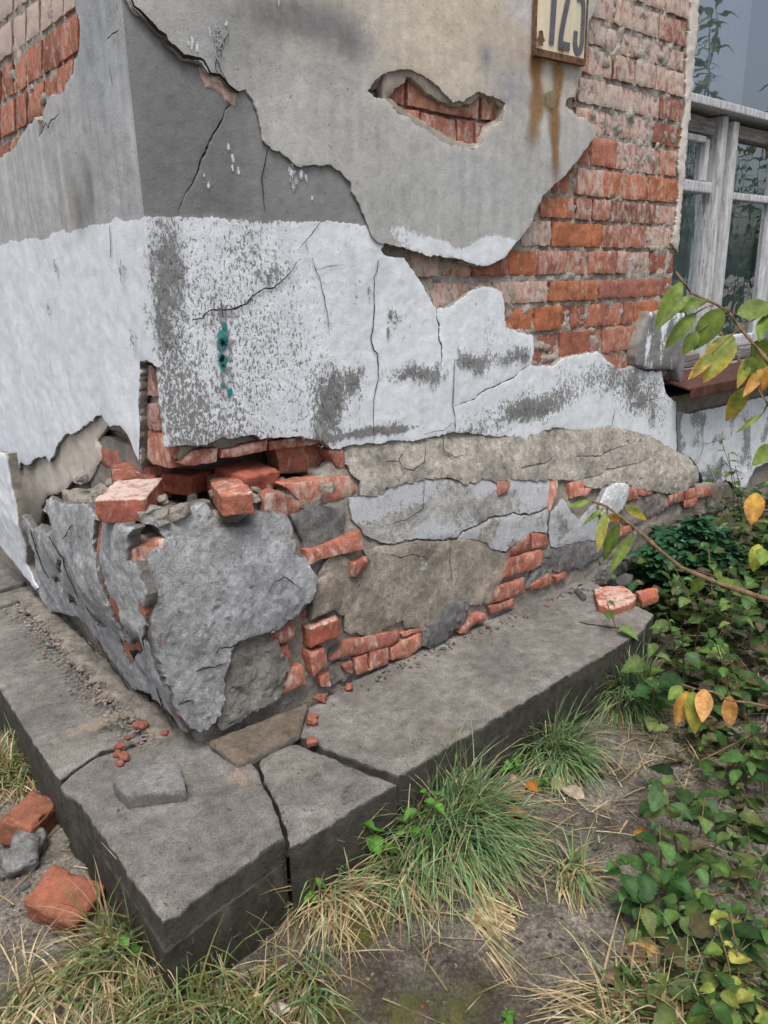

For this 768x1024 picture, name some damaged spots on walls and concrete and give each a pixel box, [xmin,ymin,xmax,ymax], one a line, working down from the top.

spalling [369,70,459,104]
corrosion [530,30,565,171]
crack [260,148,268,208]
crack [193,222,337,336]
crack [370,260,379,429]
peeling [395,346,484,391]
peeling [623,310,685,429]
crack [385,364,464,526]
peeling [597,482,630,524]
spalling [69,531,143,663]
spalling [593,586,659,616]
crack [258,771,290,858]